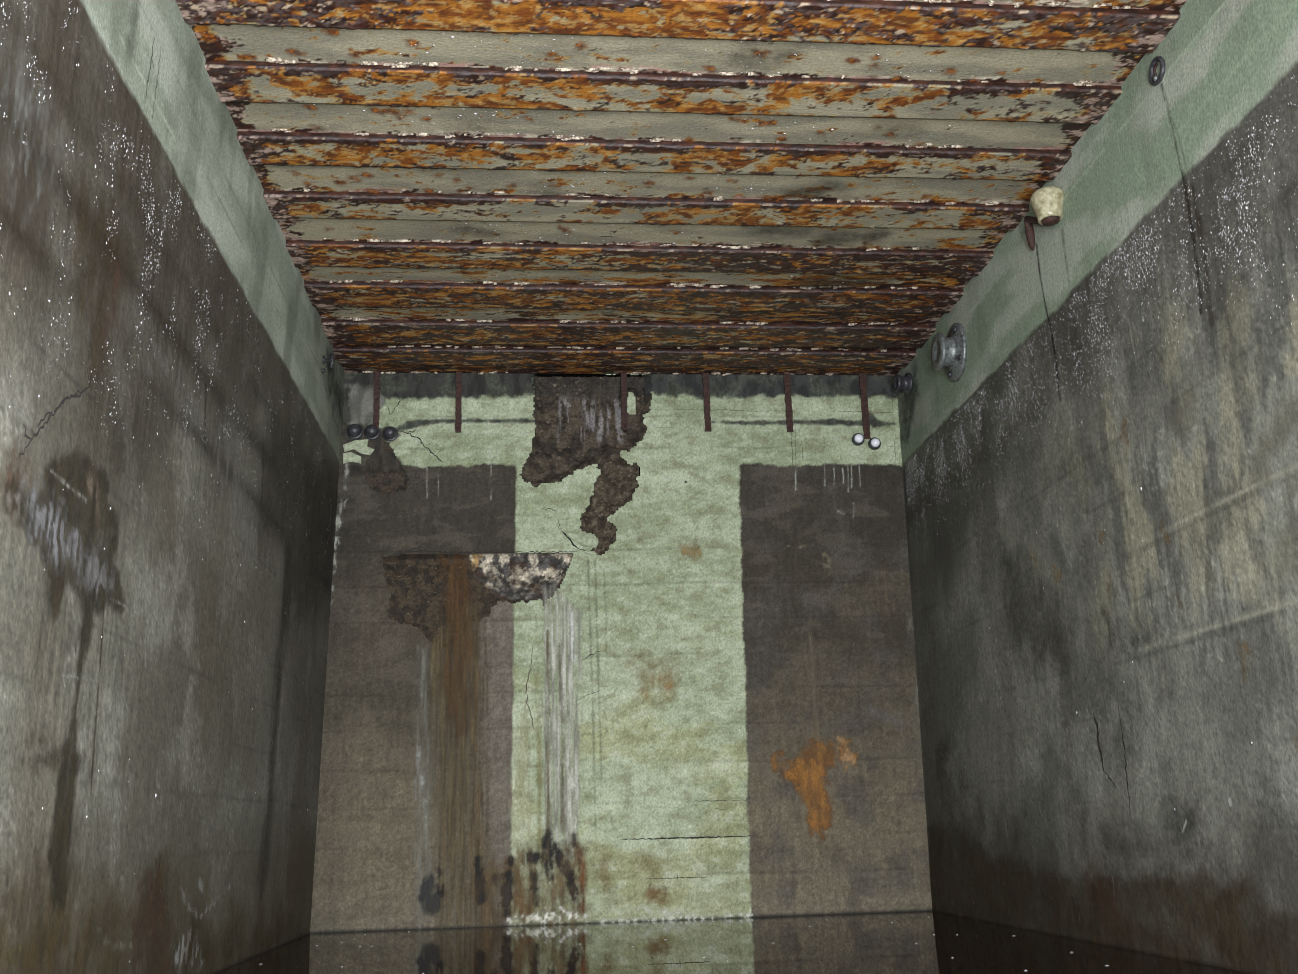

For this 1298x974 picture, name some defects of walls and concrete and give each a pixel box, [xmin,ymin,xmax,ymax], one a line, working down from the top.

corrosion [730,117,786,141]
corrosion [335,172,379,193]
crack [18,374,92,458]
peeling [339,371,438,495]
spalling [382,372,652,650]
leakage [0,454,124,974]
leakage [475,588,753,924]
corrosion [772,738,857,837]
leakage [129,874,213,974]
leakage [418,854,444,914]